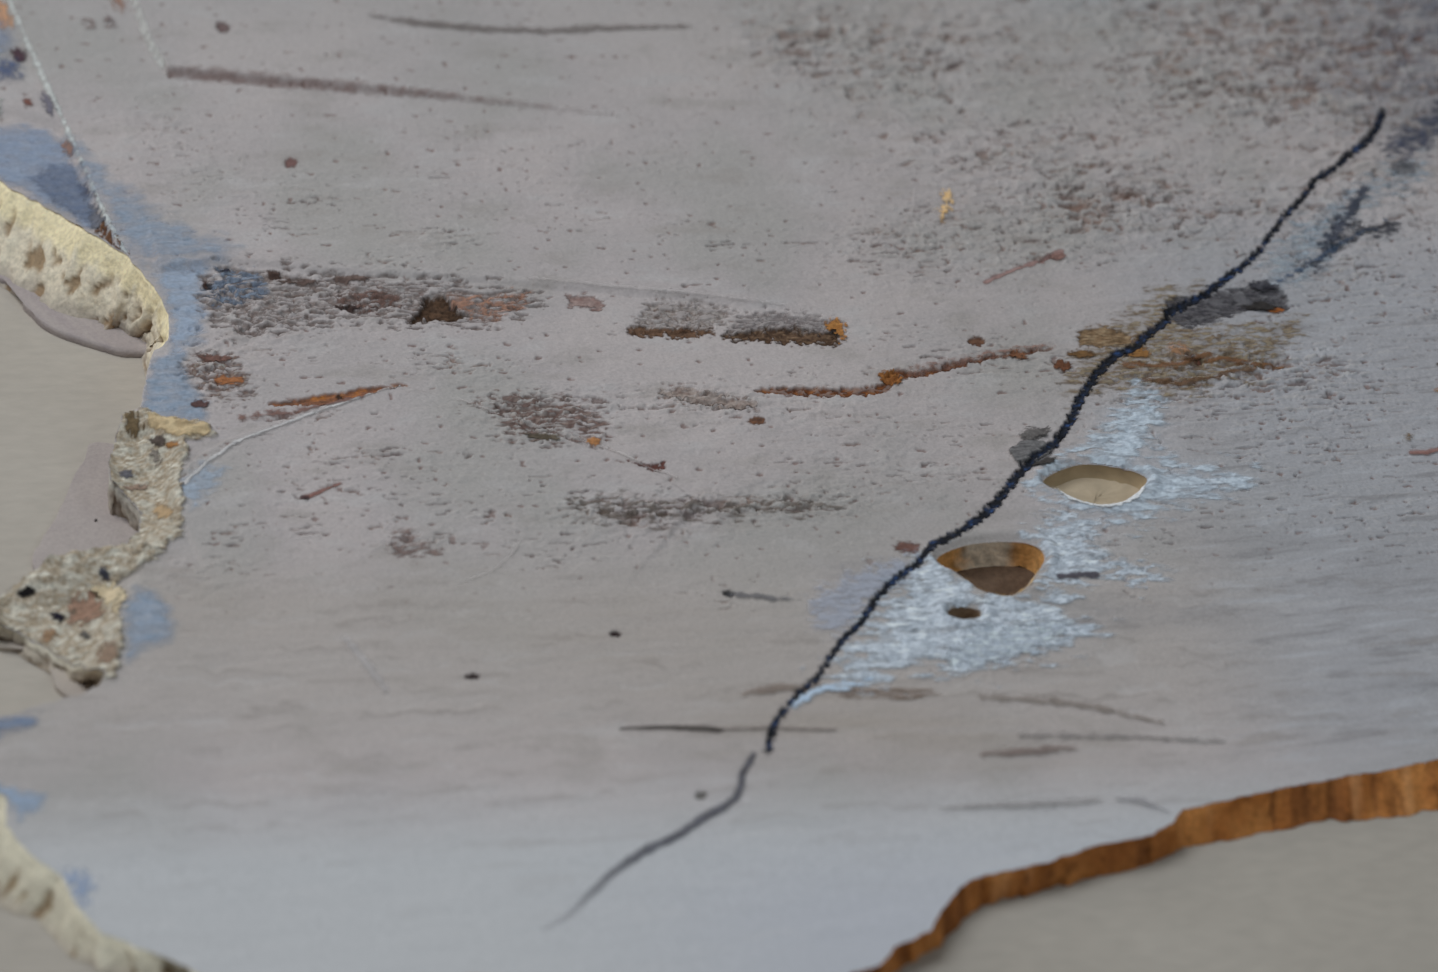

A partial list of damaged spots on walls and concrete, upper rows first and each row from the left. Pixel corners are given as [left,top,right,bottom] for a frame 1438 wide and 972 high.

corrosion [1065,285,1308,399]
damp [730,592,789,600]
crack [610,107,1385,874]
damp [749,378,1260,708]
damp [982,715,1213,756]